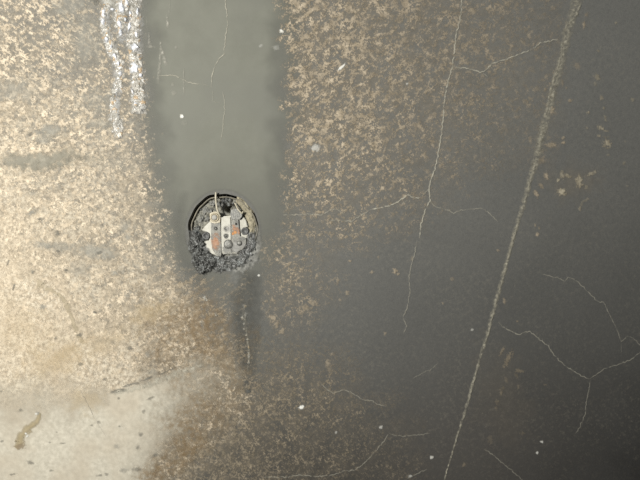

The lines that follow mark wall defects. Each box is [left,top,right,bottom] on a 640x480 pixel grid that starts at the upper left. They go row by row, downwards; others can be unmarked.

water stain [111,0,145,114]
crack [374,0,556,235]